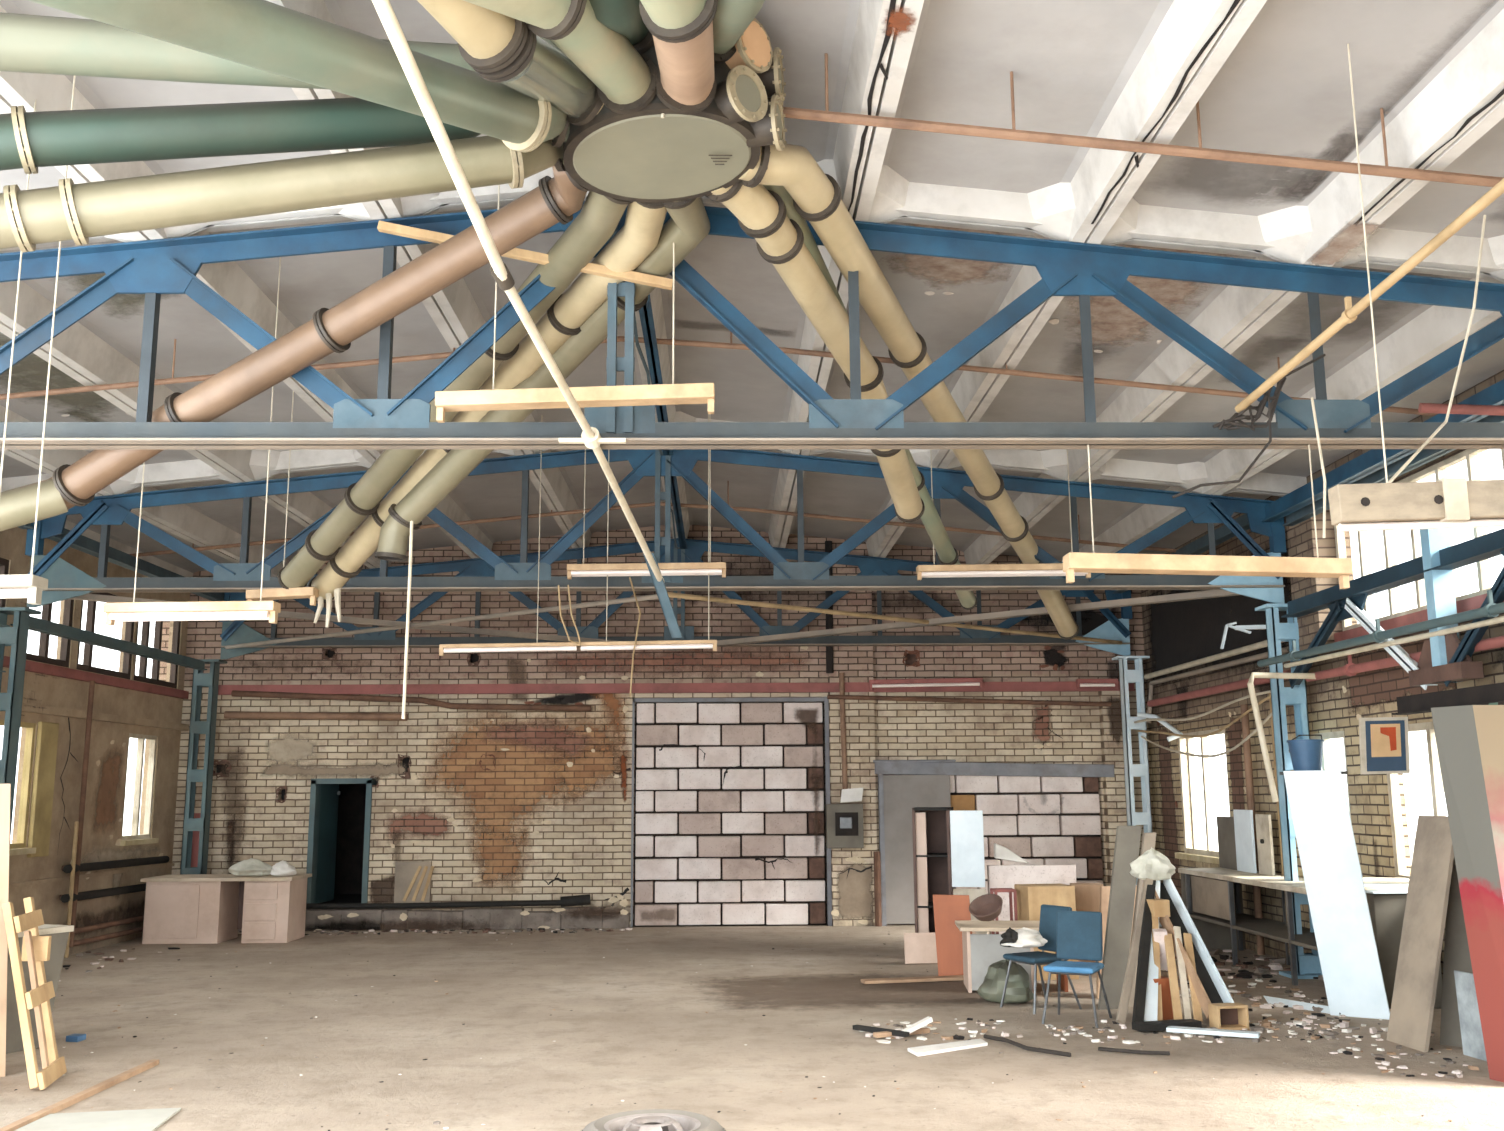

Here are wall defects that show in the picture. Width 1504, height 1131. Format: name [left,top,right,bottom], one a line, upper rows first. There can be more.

peeling [70,740,141,888]
peeling [388,646,809,885]